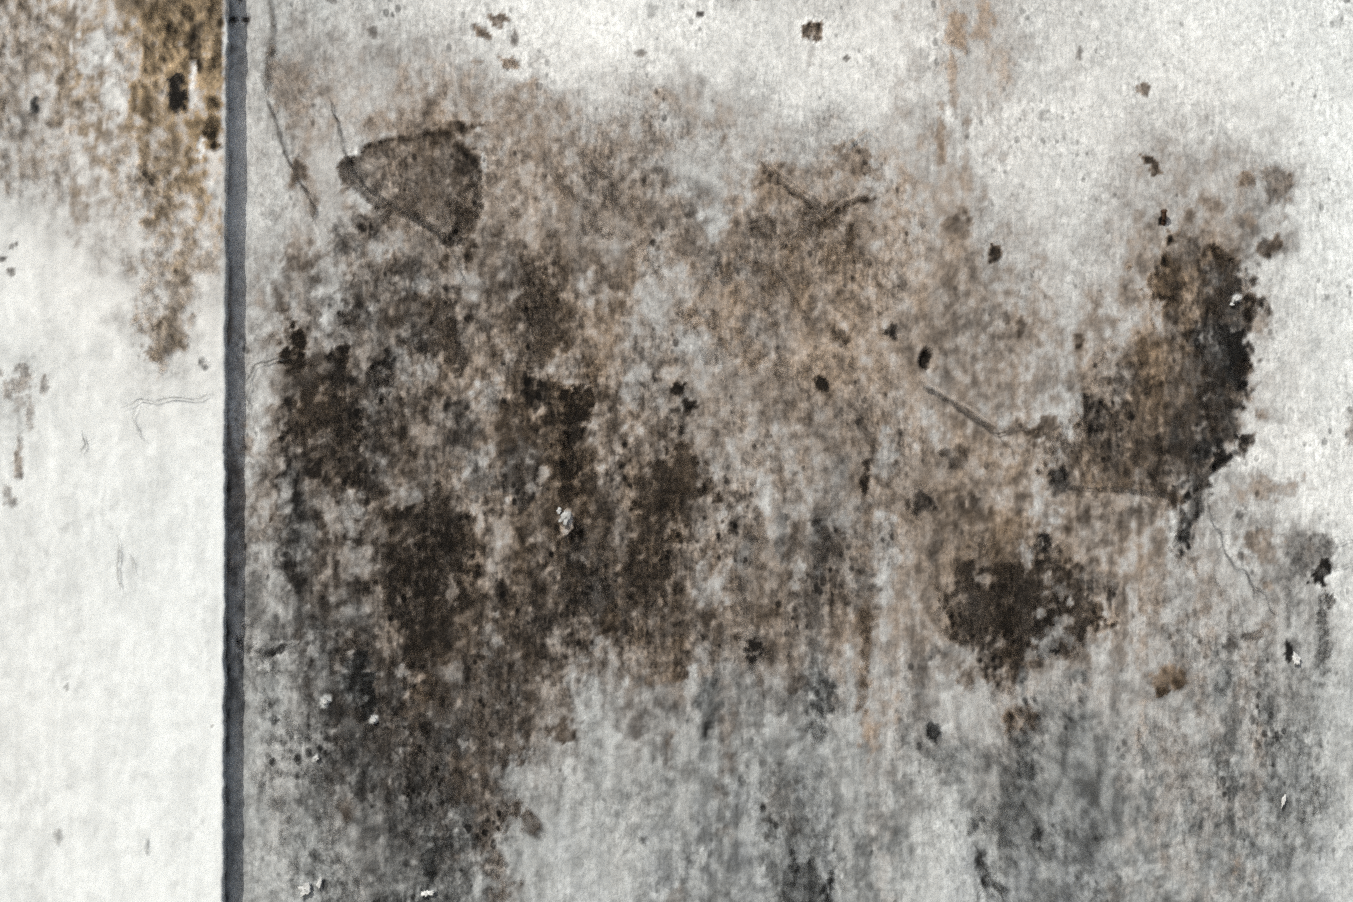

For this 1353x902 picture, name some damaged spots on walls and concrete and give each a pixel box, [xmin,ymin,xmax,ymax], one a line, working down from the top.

leakage [0,0,70,185]
leakage [104,0,249,360]
leakage [988,243,1001,263]
leakage [1142,156,1159,171]
leakage [1239,167,1292,204]
leakage [1257,233,1283,258]
leakage [260,92,938,902]
leakage [922,441,968,471]
leakage [1036,235,1268,561]
leakage [1285,534,1335,603]
leakage [917,536,1122,902]
leakage [1181,634,1321,879]